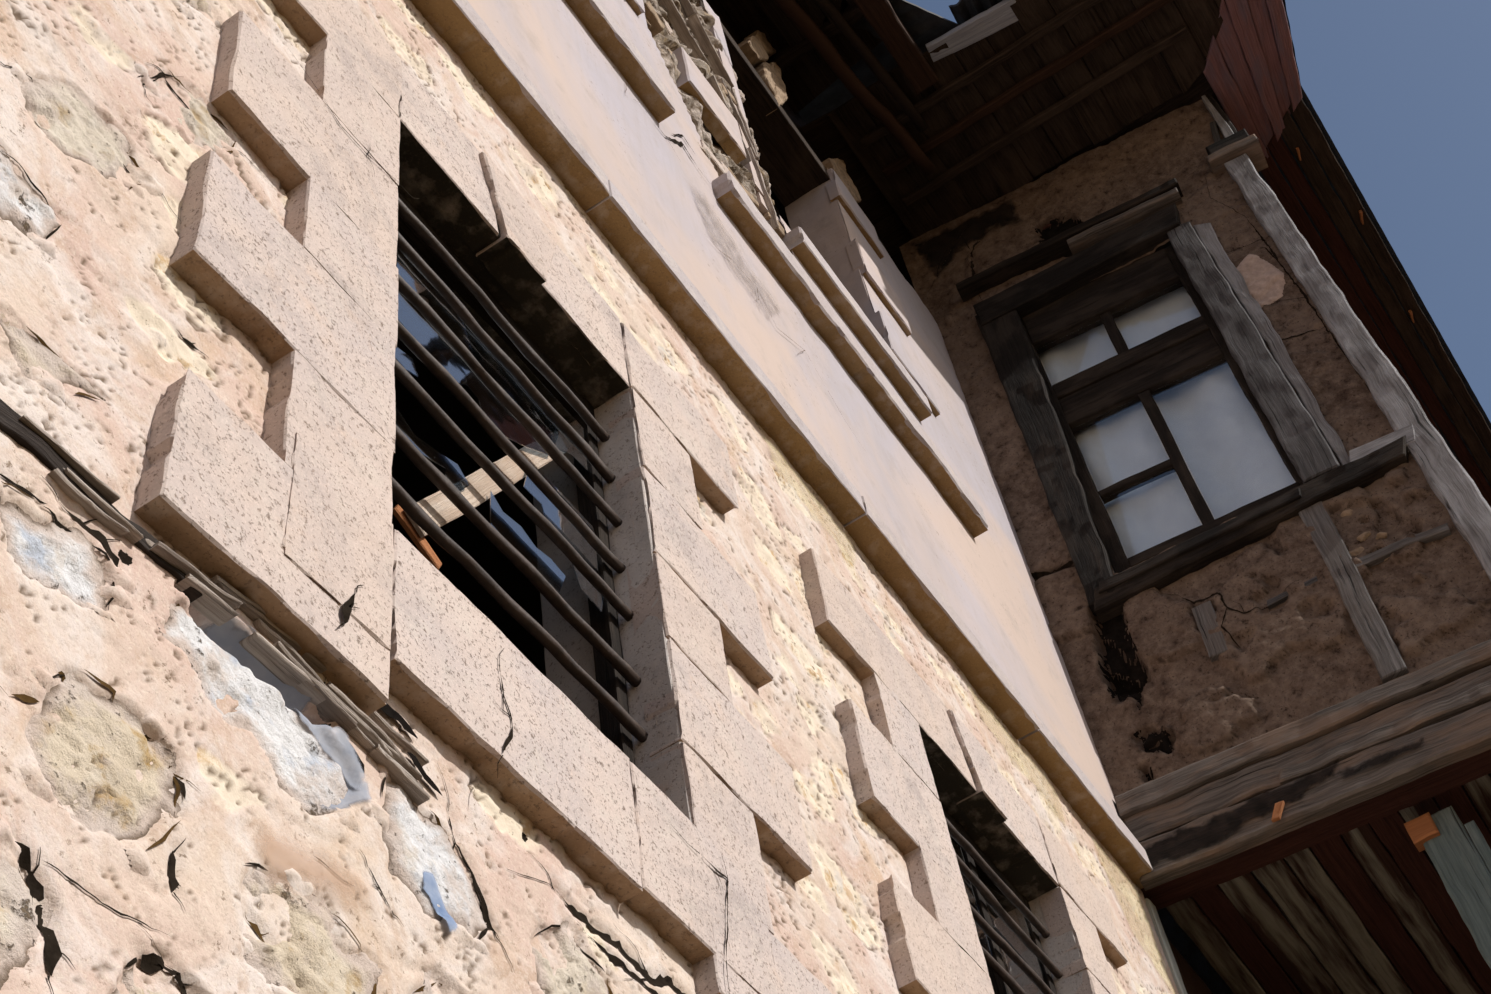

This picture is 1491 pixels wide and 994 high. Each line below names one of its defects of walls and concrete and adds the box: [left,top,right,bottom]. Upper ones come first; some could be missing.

crack [0,671,66,703]
crack [173,773,198,799]
crack [493,650,513,776]
spalling [1095,605,1148,710]
spalling [1133,726,1174,782]
crack [1147,575,1305,647]
crack [15,838,187,994]
crack [245,916,268,942]
crack [437,763,685,994]
crack [674,828,730,992]